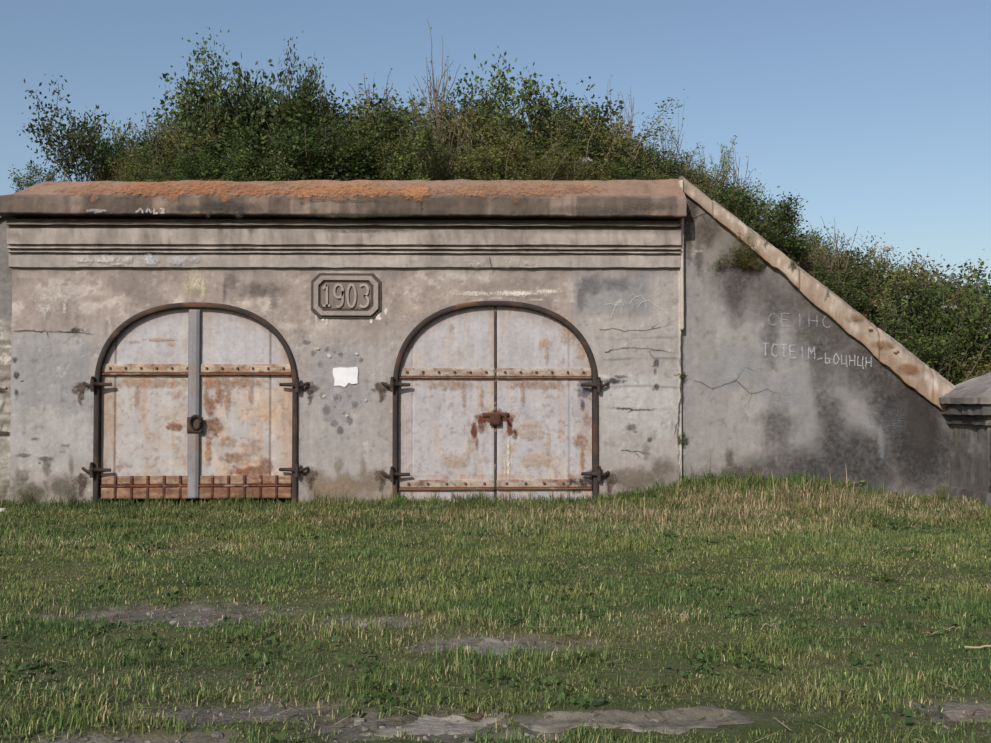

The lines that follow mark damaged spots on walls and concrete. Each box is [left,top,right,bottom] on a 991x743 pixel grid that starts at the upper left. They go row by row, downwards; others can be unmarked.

rust [200,376,271,476]
peeling [303,341,363,367]
peeling [321,378,367,433]
rust [471,391,517,474]
crack [600,326,772,434]
water stain [770,350,952,486]